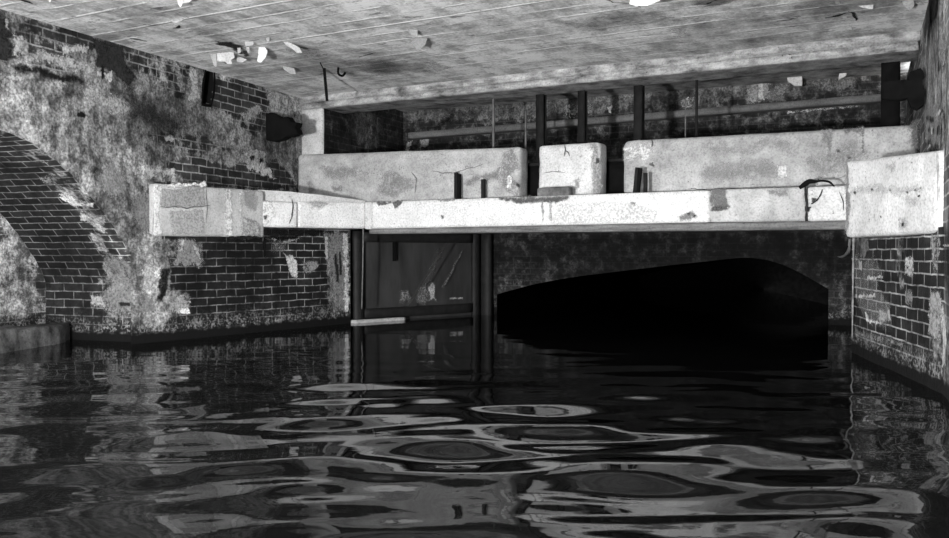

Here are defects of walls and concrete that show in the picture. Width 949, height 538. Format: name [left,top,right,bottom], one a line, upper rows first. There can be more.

peeling [171,0,191,23]
water stain [915,0,937,43]
water stain [0,13,187,142]
water stain [188,68,200,101]
spalling [201,37,270,107]
water stain [241,105,263,122]
water stain [92,162,207,234]
water stain [91,239,203,314]
water stain [928,292,947,367]